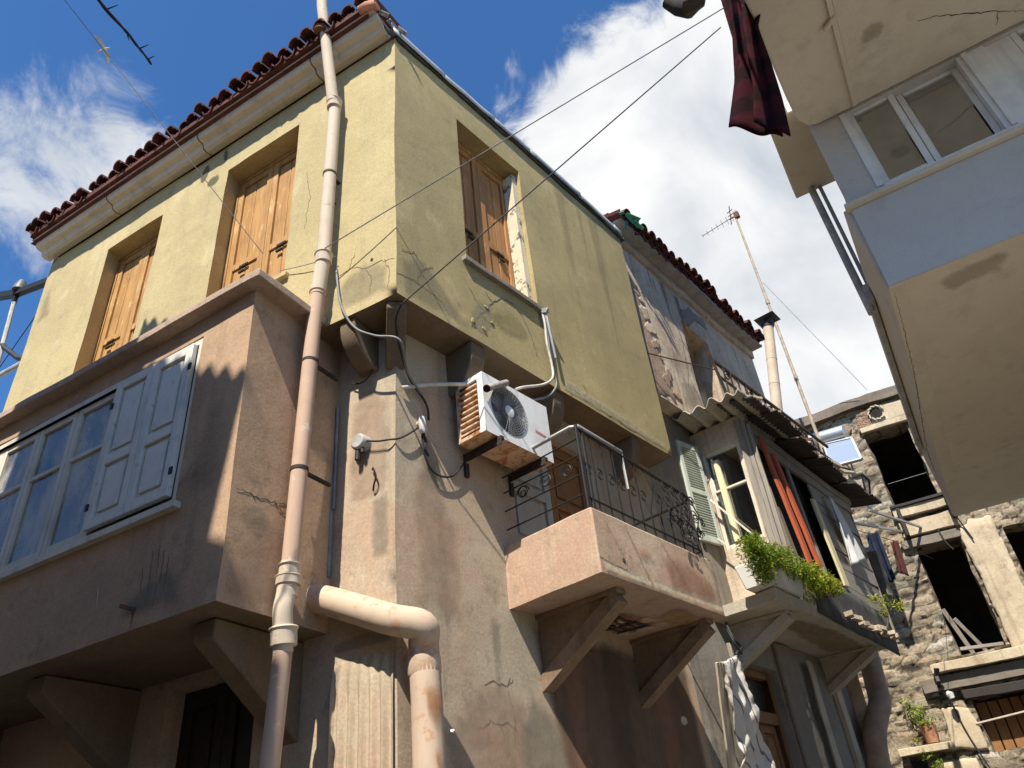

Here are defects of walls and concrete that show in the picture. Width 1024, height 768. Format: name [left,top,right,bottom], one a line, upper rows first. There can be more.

crack [919,10,1022,22]
crack [339,251,430,292]
crack [470,289,538,357]
peeling [629,279,682,401]
crack [236,488,287,514]
spalling [606,614,654,635]